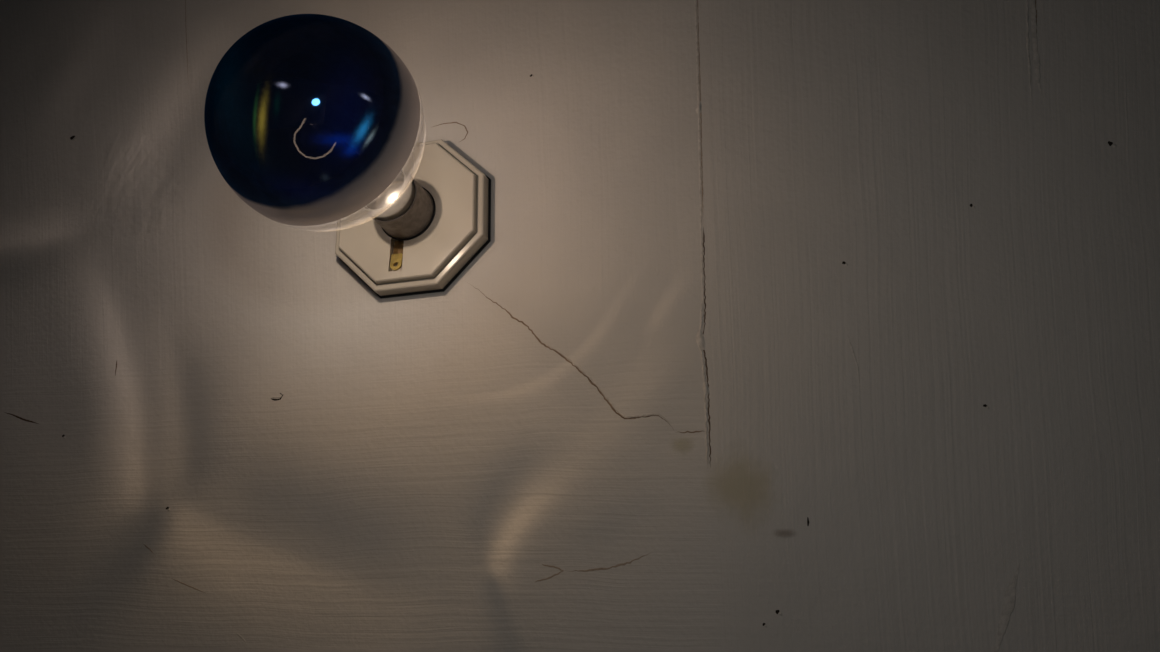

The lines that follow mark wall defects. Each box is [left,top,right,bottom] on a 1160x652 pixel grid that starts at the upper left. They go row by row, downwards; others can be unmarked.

crack [473,0,711,468]